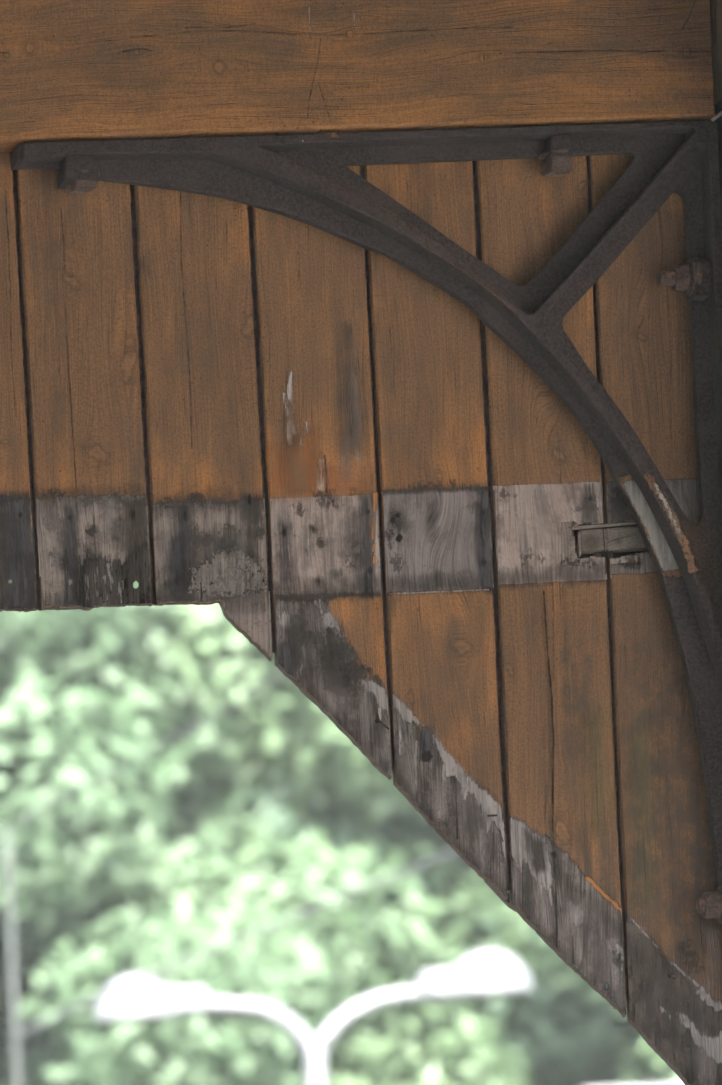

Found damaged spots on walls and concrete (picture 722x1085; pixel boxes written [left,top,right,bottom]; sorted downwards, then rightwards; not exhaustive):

damp [282,371,328,493]
damp [63,504,80,606]
damp [122,498,152,604]
damp [164,502,194,601]
rust [617,472,699,578]
damp [314,624,553,906]
damp [609,942,623,973]
damp [660,1006,722,1065]